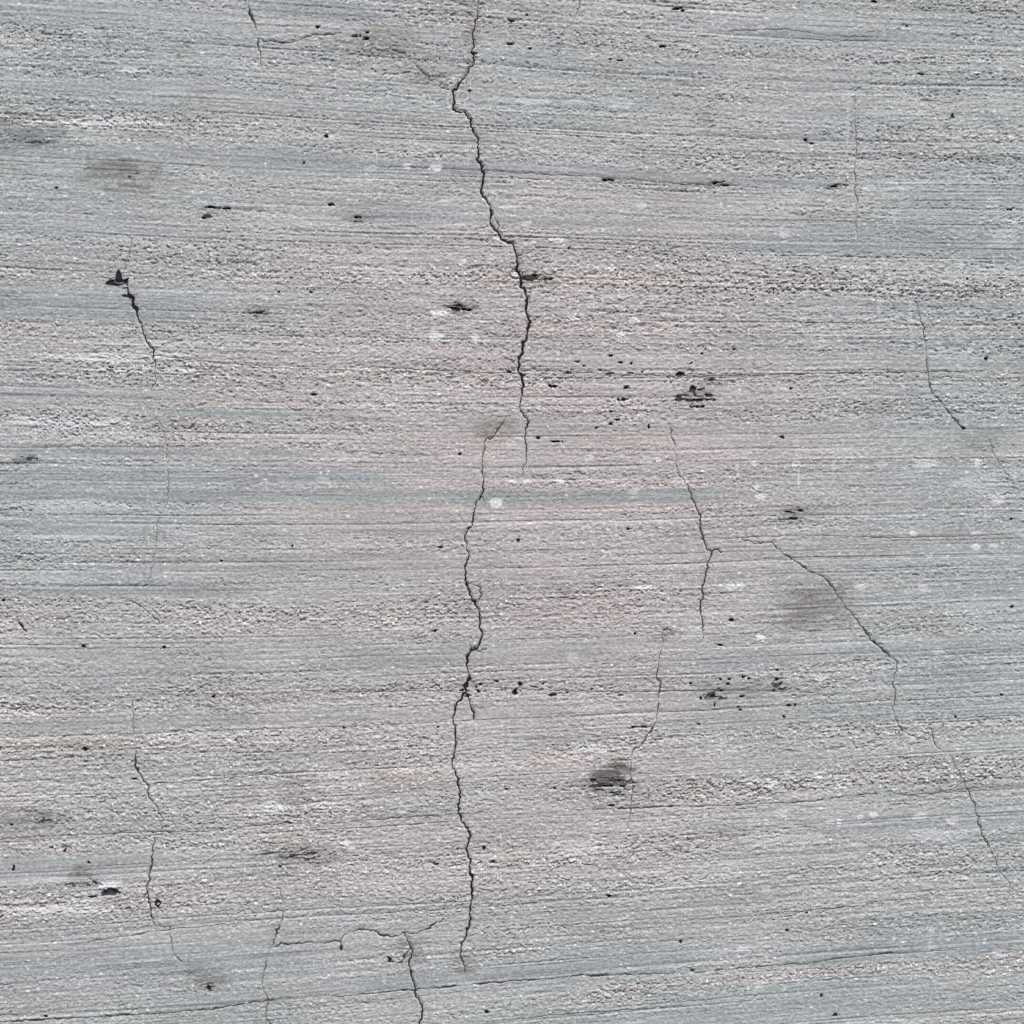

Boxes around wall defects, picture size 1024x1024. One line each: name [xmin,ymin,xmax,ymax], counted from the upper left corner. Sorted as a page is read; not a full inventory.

crack [124,228,157,390]
crack [262,0,539,1024]
crack [670,429,1018,907]
crack [914,300,963,429]